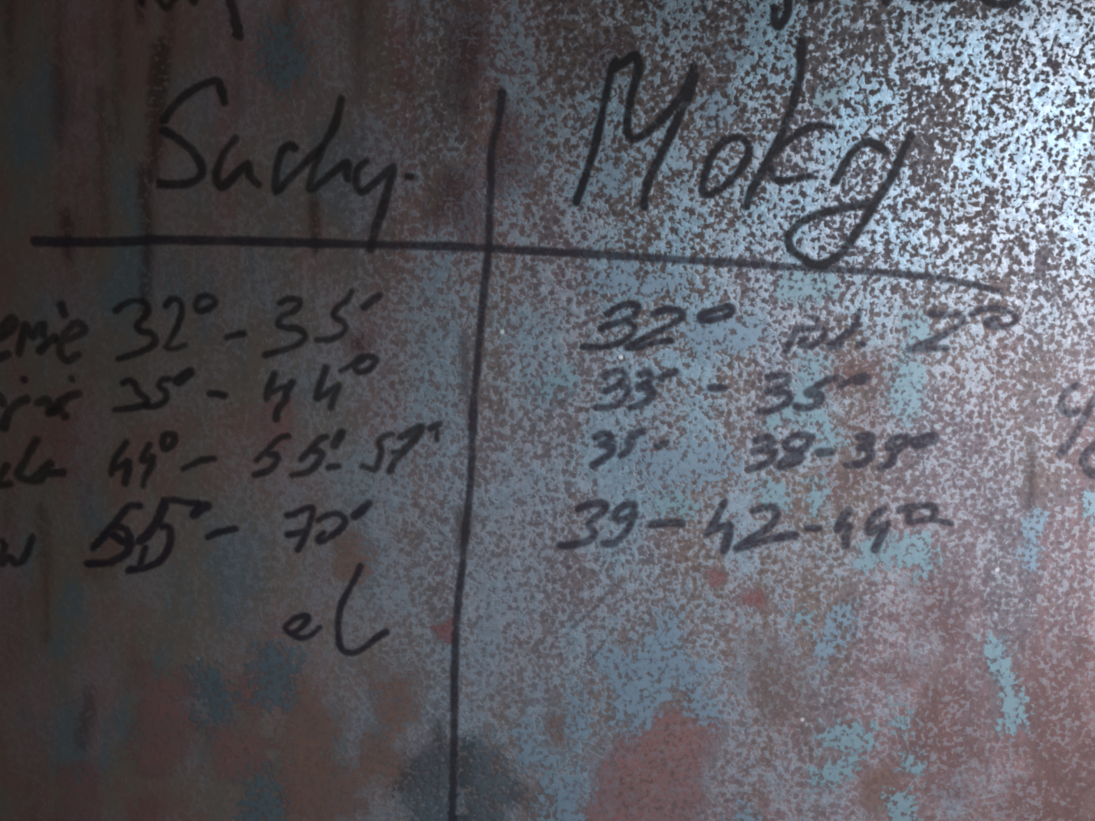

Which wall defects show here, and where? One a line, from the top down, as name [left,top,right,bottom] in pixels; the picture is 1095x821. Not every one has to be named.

corrosion [912,578,966,644]
corrosion [909,680,979,798]
corrosion [998,651,1095,821]